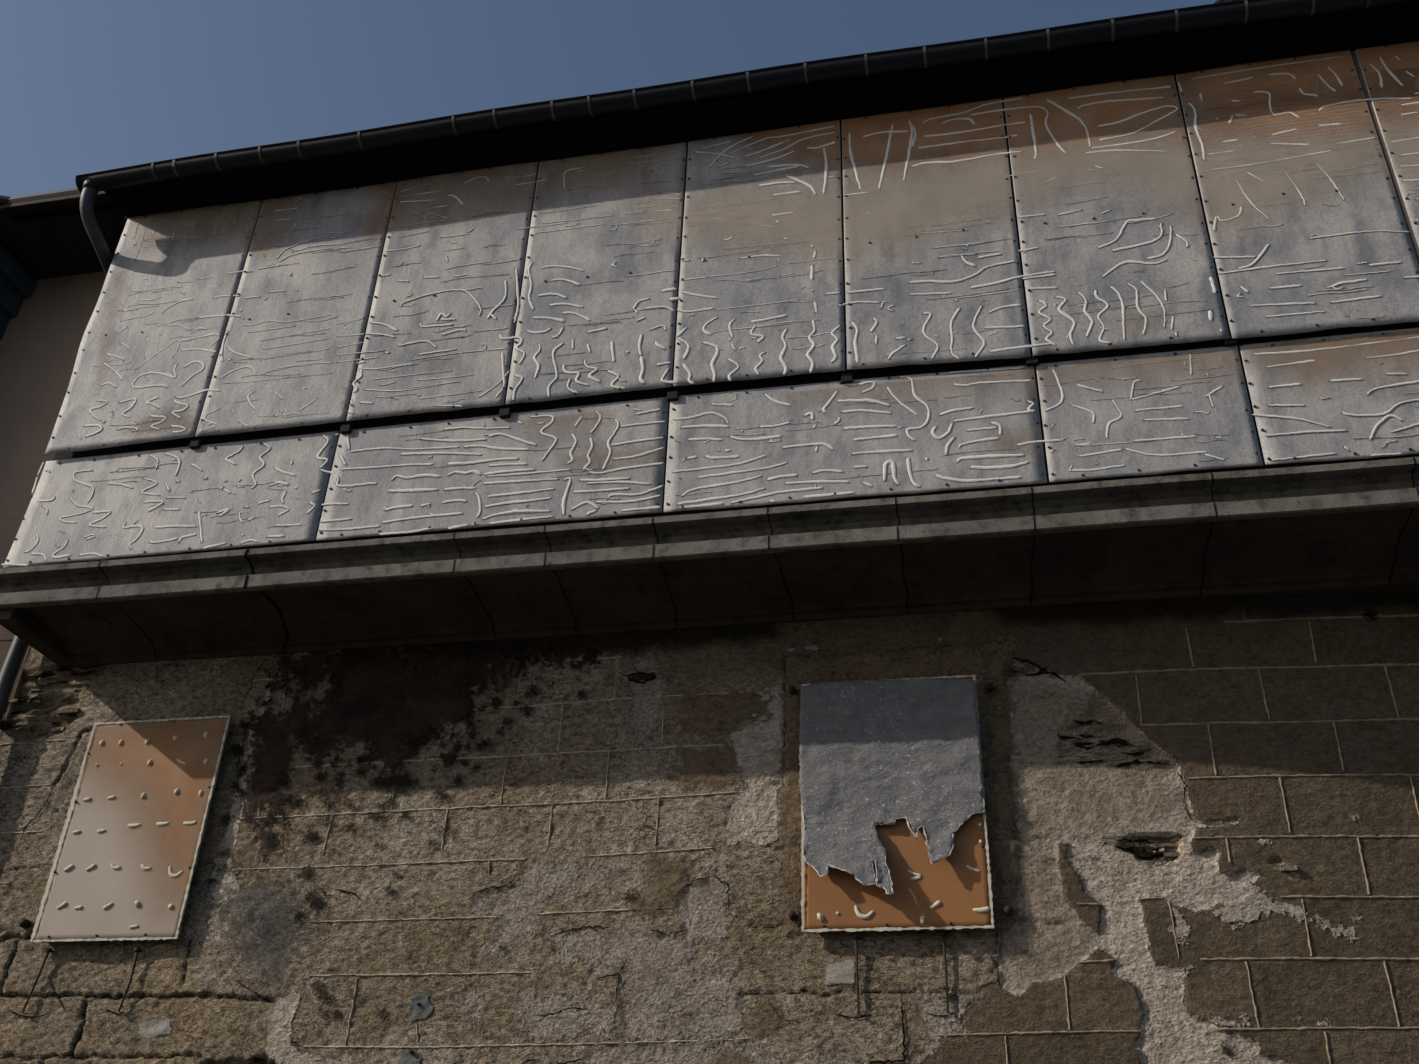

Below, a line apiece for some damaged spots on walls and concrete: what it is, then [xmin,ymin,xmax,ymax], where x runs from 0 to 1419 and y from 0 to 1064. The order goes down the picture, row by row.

flaking render [209,682,273,904]
leakage [86,622,775,924]
flaking render [725,686,785,846]
crack [468,873,518,900]
crack [650,866,730,936]
spalling [997,659,1364,1064]
flaking render [200,989,342,1064]
leakage [312,967,361,1006]
crack [521,1056,586,1064]
crack [538,925,624,1016]
flaking render [453,853,985,1064]
crack [869,993,907,1064]